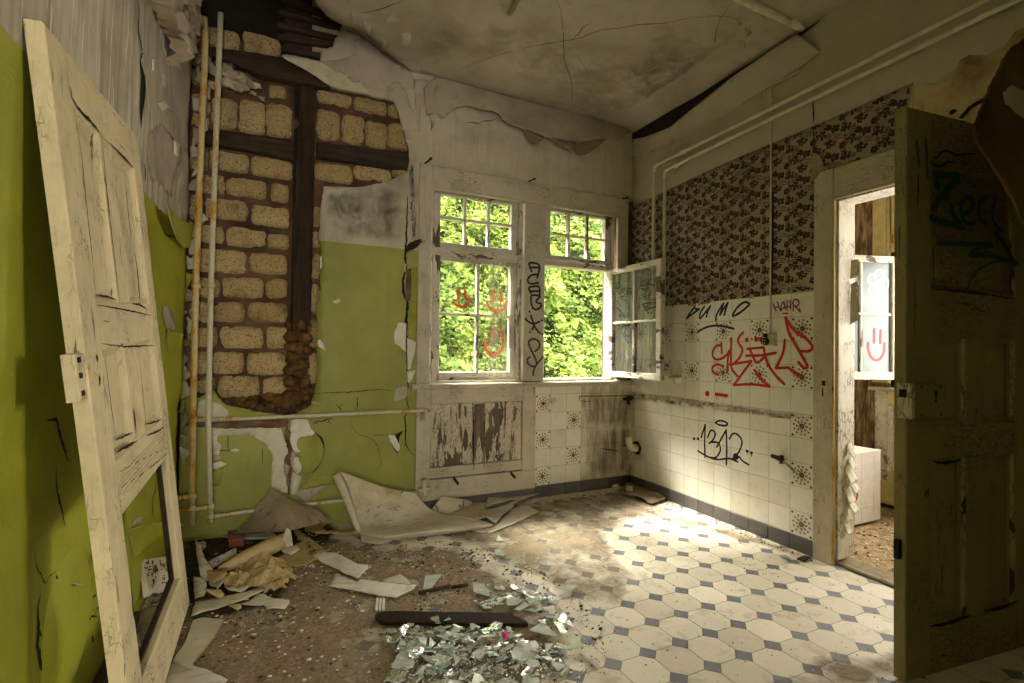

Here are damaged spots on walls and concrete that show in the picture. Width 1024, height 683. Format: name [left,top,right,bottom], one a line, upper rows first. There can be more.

crack [459,0,750,118]
flaking render [912,28,1024,123]
flaking render [147,0,432,502]
crack [262,163,417,495]
peeling [458,403,500,464]